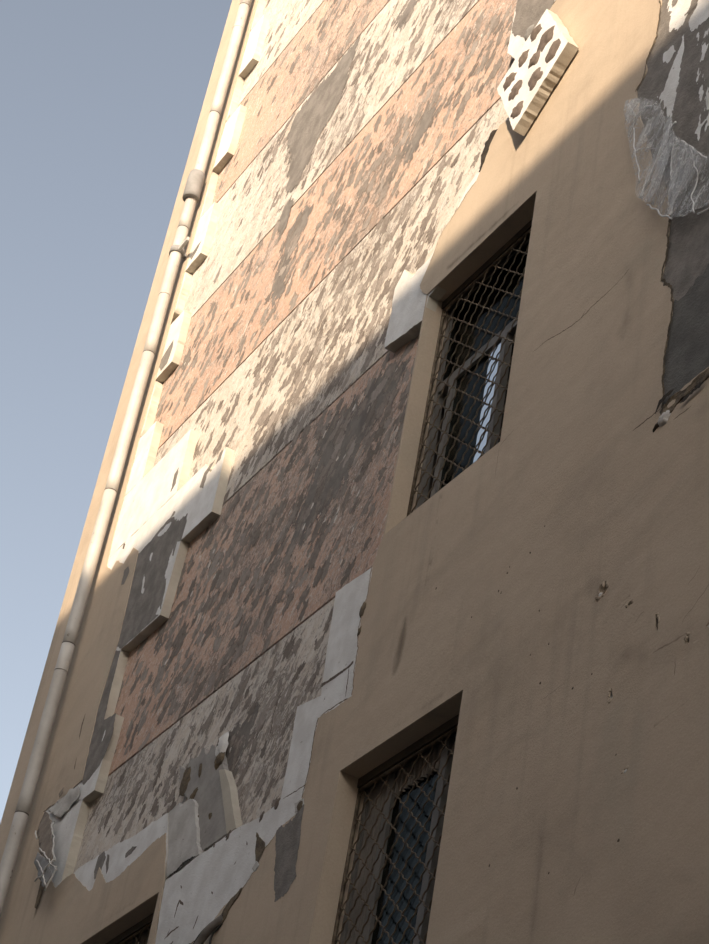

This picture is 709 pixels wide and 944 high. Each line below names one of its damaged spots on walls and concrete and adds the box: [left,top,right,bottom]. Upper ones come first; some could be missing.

peeling [657,0,709,141]
spalling [653,368,709,432]
peeling [179,763,202,799]
peeling [214,752,225,770]
peeling [246,798,304,902]
peeling [34,852,52,909]
spalling [218,887,242,930]